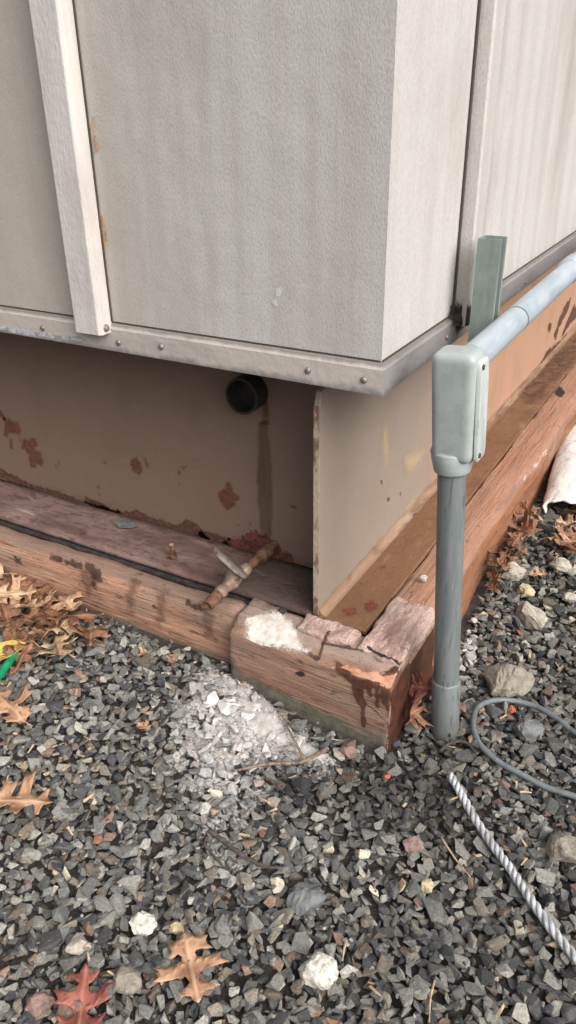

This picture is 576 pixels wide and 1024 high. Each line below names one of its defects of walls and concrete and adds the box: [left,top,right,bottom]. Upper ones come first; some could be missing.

peeling [548,298,576,340]
leakage [258,402,271,537]
peeling [0,468,231,544]
peeling [217,481,240,510]
peeling [50,555,103,586]
crack [299,630,400,665]
leakage [231,628,434,753]